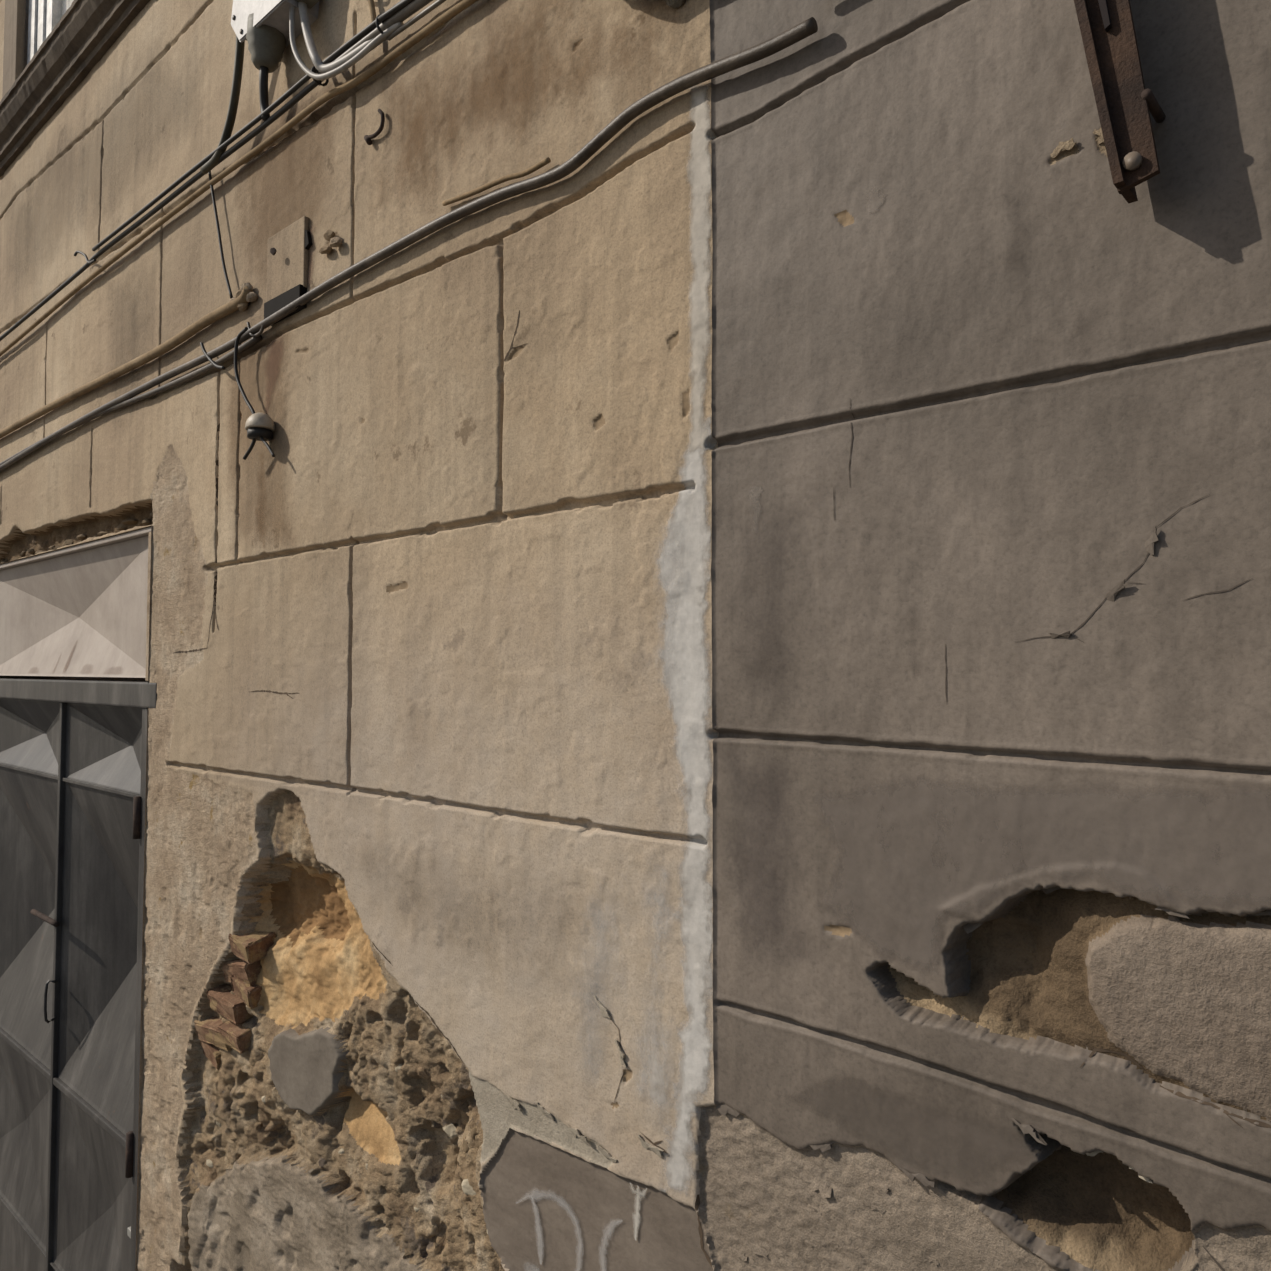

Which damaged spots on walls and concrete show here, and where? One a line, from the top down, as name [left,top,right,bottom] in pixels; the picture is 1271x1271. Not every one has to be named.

crack [1018,494,1210,642]
crack [1182,578,1253,601]
flaking render [0,444,617,1271]
crack [589,992,627,1103]
flaking render [887,886,1271,1120]
crack [643,1134,670,1156]
peeling [696,1102,1271,1271]